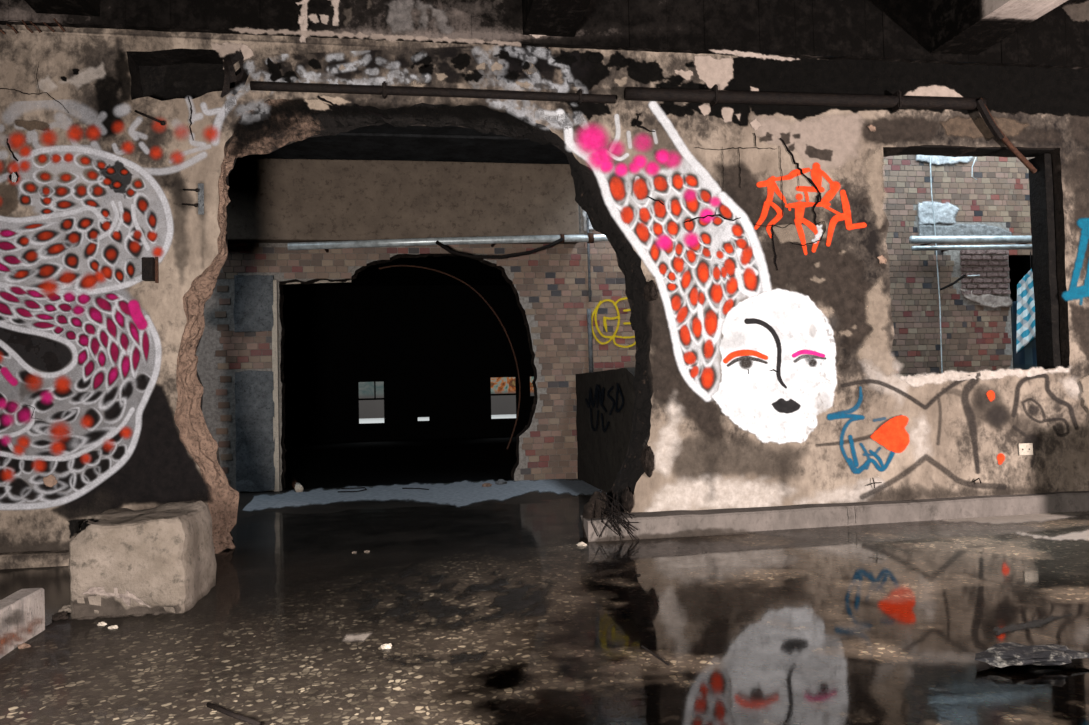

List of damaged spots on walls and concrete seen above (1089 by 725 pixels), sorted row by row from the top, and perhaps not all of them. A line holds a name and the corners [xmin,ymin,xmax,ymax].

peeling [211,0,546,69]
crack [0,65,69,113]
peeling [674,49,799,90]
peeling [904,85,962,97]
peeling [699,103,886,228]
flaking render [916,155,973,165]
crack [684,133,826,270]
spalling [174,58,654,554]
spalling [858,279,1069,387]
leakage [648,297,800,512]
leakage [911,420,927,455]
leakage [803,480,981,504]